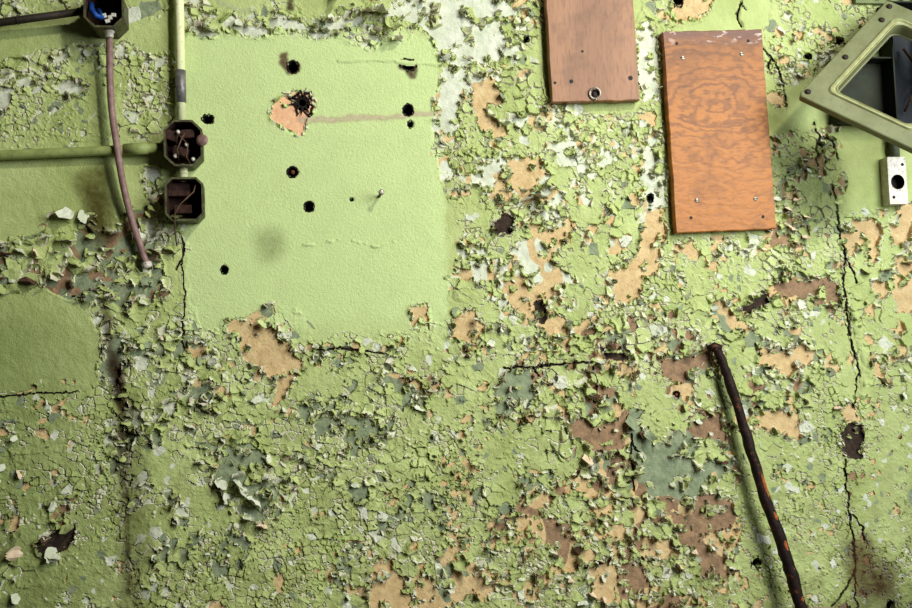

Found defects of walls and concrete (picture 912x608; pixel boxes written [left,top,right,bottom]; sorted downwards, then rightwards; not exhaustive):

peeling [0,38,177,150]
flaking render [668,0,717,28]
peeling [762,0,880,112]
peeling [639,156,671,212]
flaking render [502,275,544,321]
flaking render [608,208,670,304]
crack [832,189,861,407]
crack [0,390,76,398]
peeling [686,124,912,608]
peeling [632,427,719,502]
crack [831,460,868,608]
flaking render [369,558,414,608]